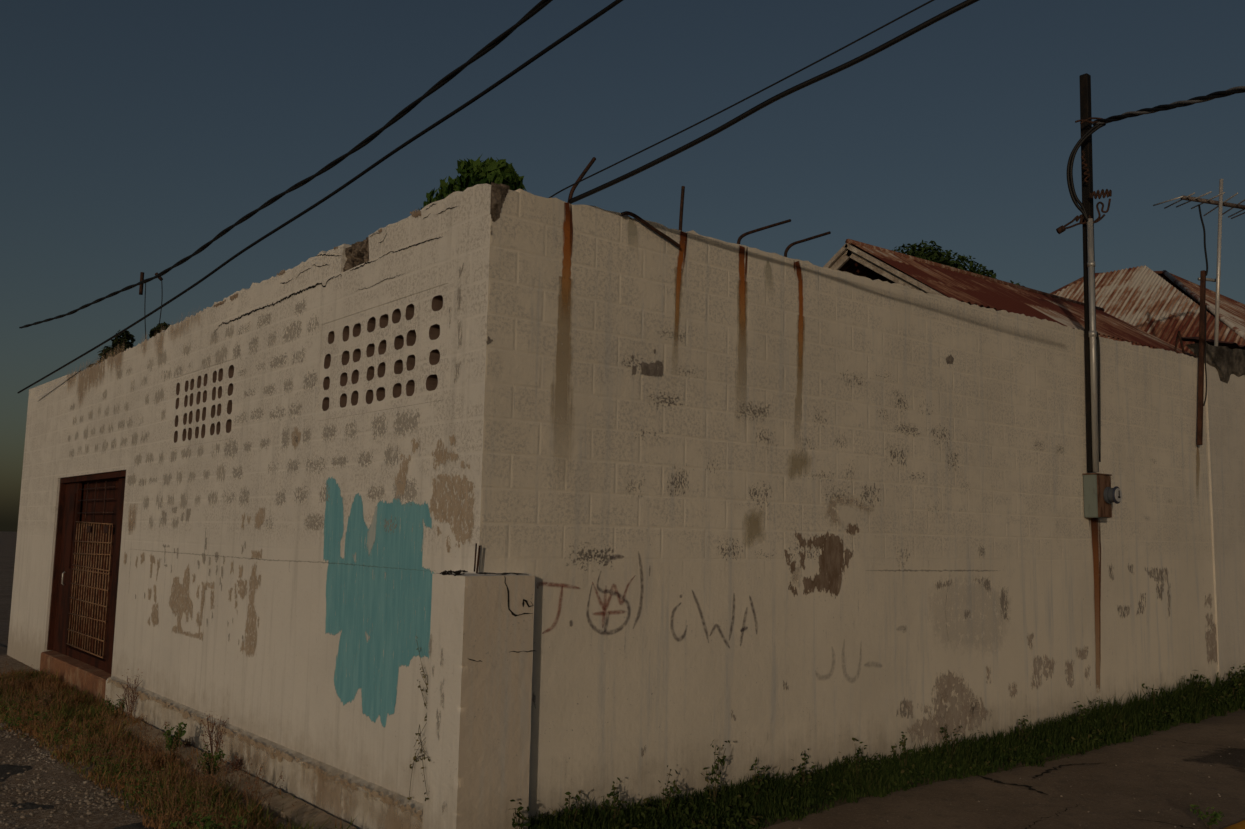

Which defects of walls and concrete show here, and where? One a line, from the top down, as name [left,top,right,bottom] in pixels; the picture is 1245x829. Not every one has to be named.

crack [213,203,457,335]
spalling [334,228,382,277]
rust [555,202,573,409]
rust [674,231,687,340]
rust [738,246,748,376]
rust [794,261,805,408]
peeling [395,435,475,552]
peeling [124,506,265,657]
peeling [784,523,859,599]
rust [1089,518,1101,689]